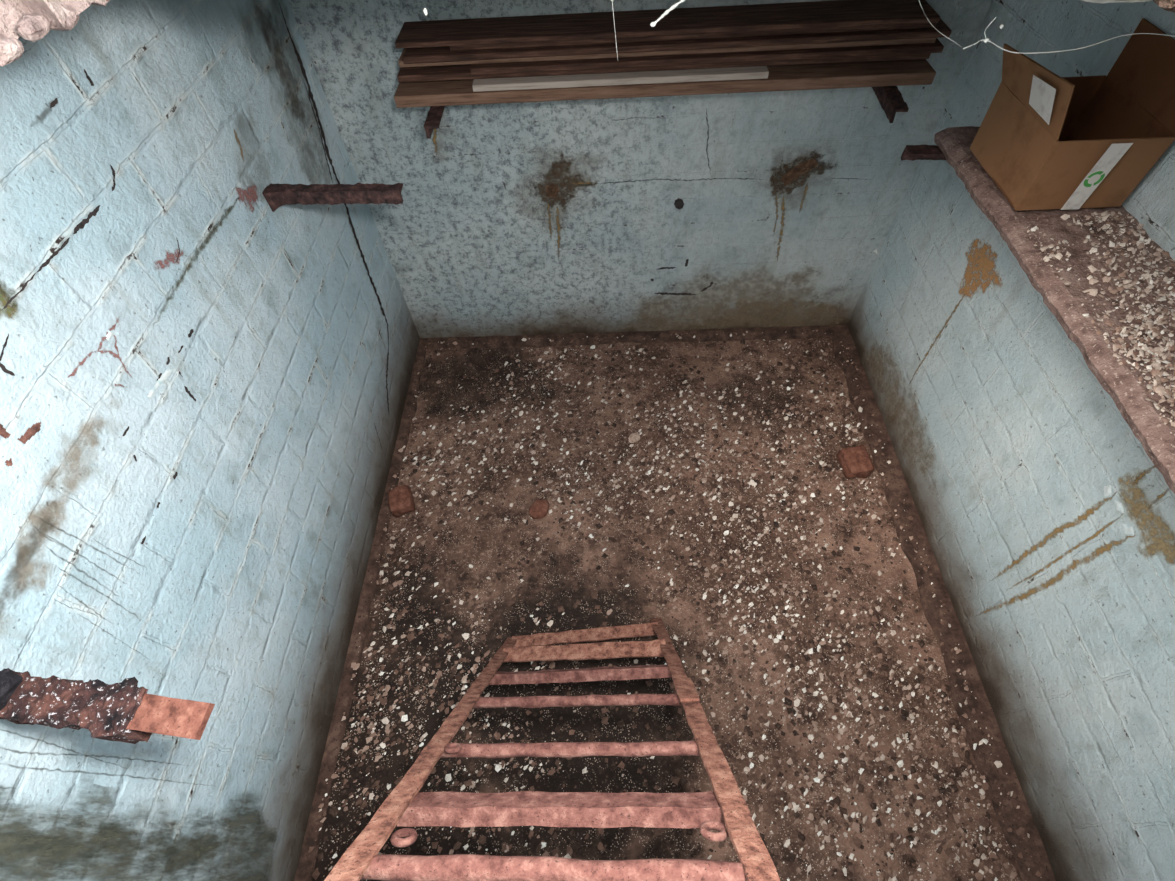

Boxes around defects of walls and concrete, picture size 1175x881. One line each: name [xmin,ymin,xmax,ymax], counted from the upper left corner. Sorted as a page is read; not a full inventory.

rust [236,185,258,212]
rust [534,154,598,257]
rust [770,151,833,258]
crack [0,165,116,376]
rust [913,239,1001,376]
peeling [0,422,41,444]
rust [976,465,1175,616]
leakage [3,730,162,775]
leakage [0,791,276,881]